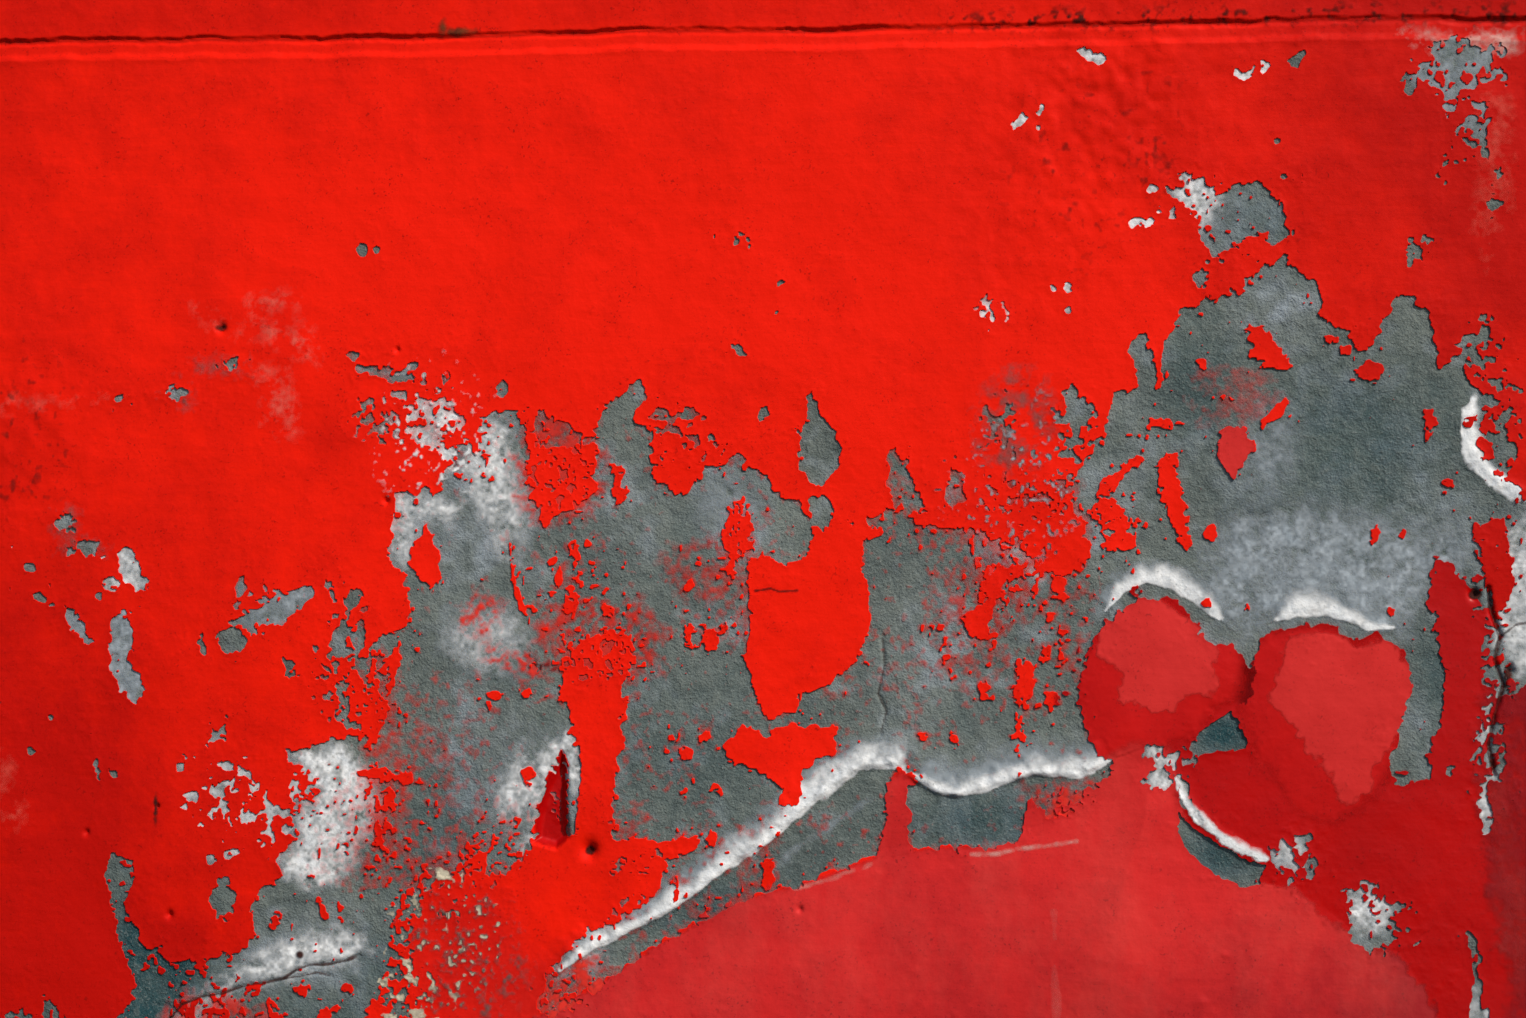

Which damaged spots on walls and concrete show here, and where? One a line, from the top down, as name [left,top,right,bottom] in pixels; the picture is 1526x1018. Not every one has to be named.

peeling [1400,35,1508,219]
peeling [54,514,100,558]
peeling [33,584,91,645]
peeling [95,547,149,600]
peeling [104,171,1526,1018]
peeling [93,758,118,781]
peeling [5,994,66,1018]
crack [169,956,355,1018]